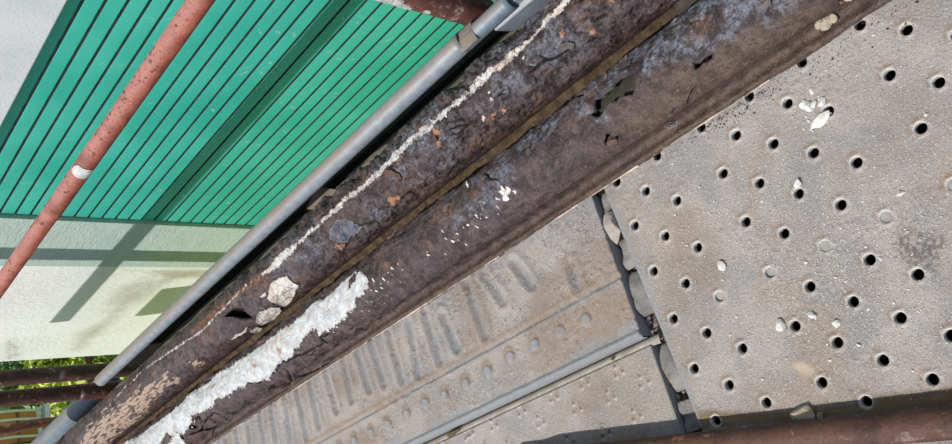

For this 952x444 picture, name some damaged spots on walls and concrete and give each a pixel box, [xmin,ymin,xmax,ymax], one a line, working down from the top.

rust [94,46,161,141]
rust [428,127,443,149]
peeling [80,0,570,444]
rust [813,390,952,416]
rust [700,412,792,437]